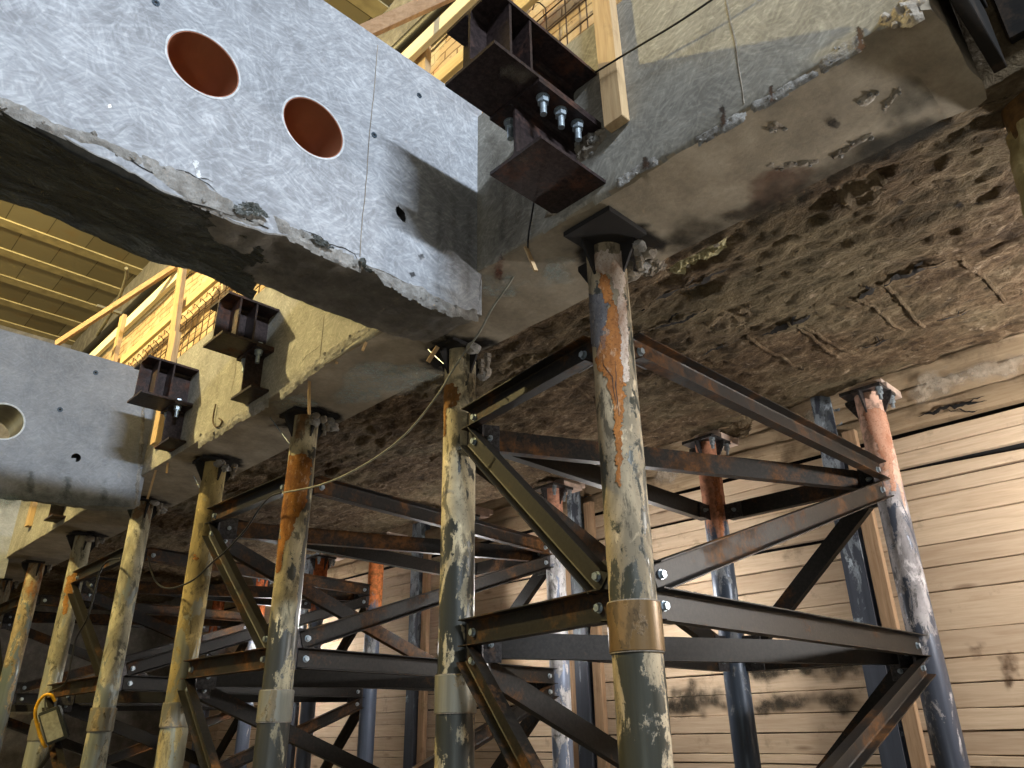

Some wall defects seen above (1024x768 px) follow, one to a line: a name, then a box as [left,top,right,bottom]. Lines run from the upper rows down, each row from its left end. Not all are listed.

spalling [878,0,926,29]
spalling [696,26,866,147]
spalling [766,132,874,172]
spalling [0,98,479,322]
spalling [831,170,888,211]
spalling [629,225,668,272]
corrosion [443,383,461,437]
spalling [495,345,564,379]
corrosion [595,273,627,487]
corrosion [863,407,897,491]
corrosion [276,453,313,573]
corrosion [710,476,724,537]